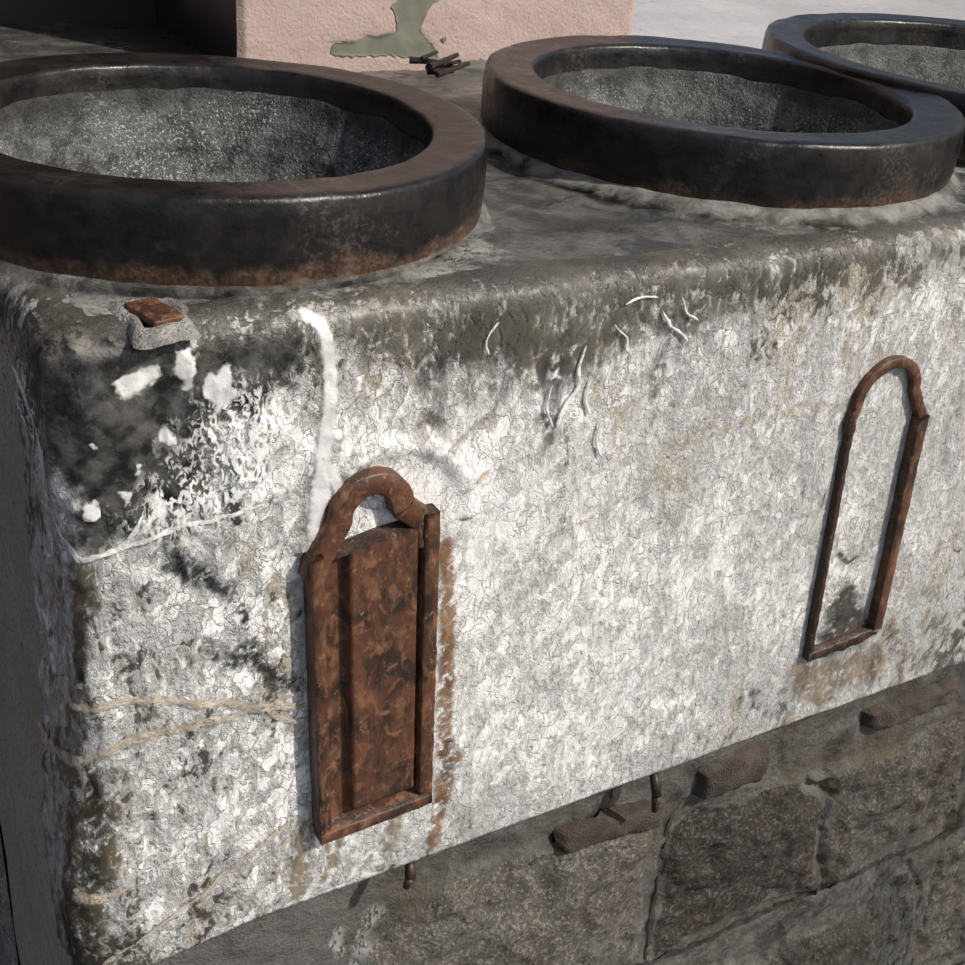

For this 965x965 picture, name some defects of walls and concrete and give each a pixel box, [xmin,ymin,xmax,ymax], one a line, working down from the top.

peeling [331,0,446,58]
water stain [62,293,120,316]
water stain [340,241,862,391]
water stain [38,307,343,550]
water stain [541,413,557,445]
water stain [152,545,237,596]
water stain [72,582,88,683]
rust [427,538,462,852]
crack [35,680,307,791]
rust [289,820,313,900]
rust [323,837,343,881]
rust [387,815,402,852]